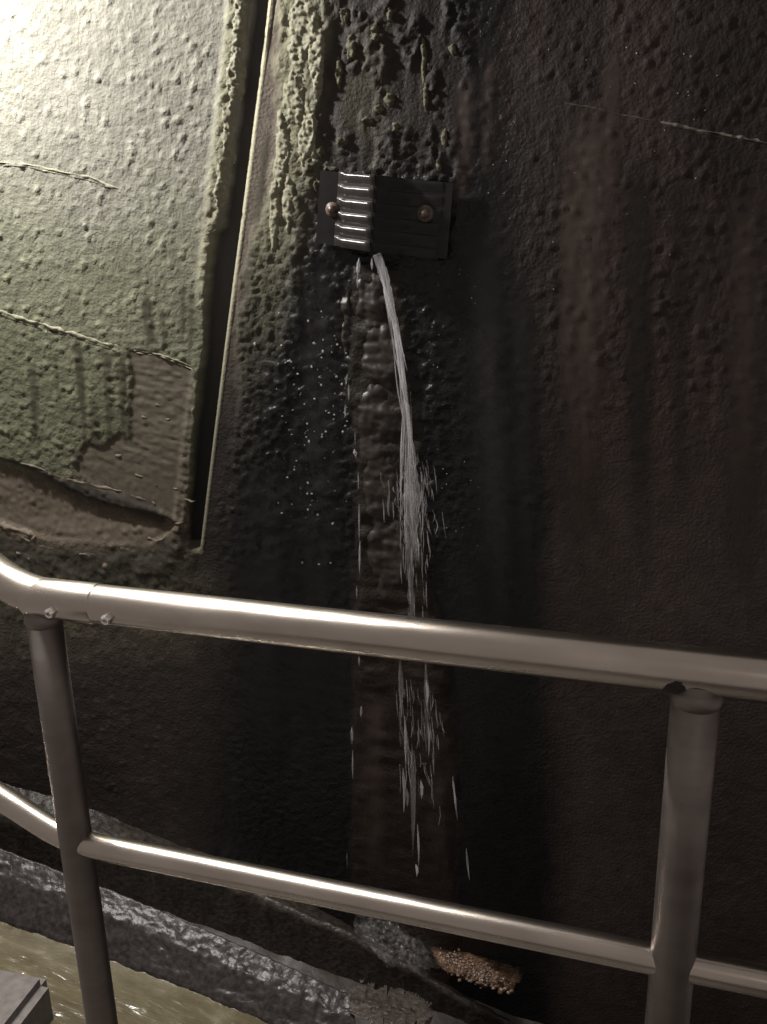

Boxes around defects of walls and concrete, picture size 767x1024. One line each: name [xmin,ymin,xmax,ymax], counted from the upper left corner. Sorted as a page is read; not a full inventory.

crack [0,162,124,193]
damp [259,0,326,253]
crack [565,102,767,146]
peeling [0,350,195,591]